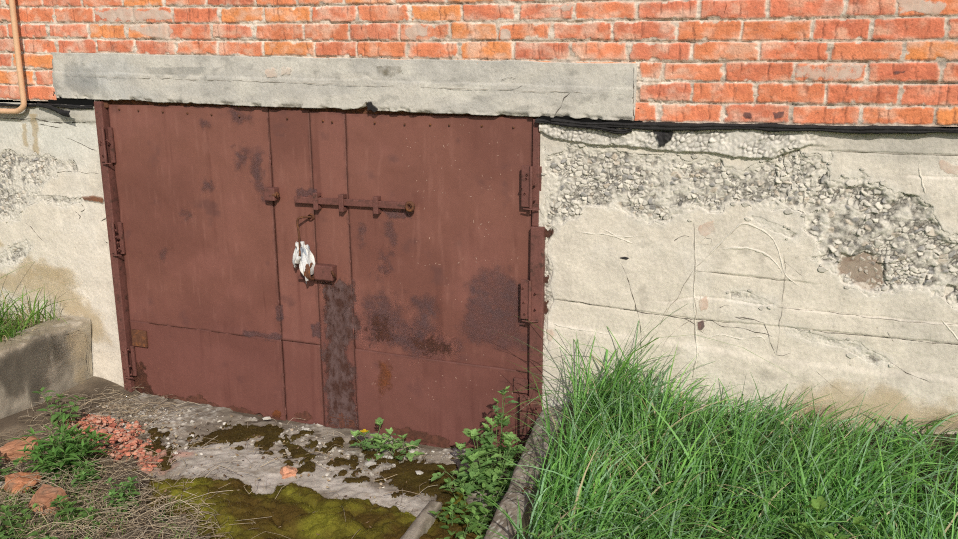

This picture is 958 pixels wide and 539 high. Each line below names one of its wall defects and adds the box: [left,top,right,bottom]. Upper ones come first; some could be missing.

spalling [0,239,32,266]
spalling [0,148,83,222]
corrosion [321,279,394,430]
spalling [542,383,562,410]
spalling [539,143,958,370]
crack [555,228,958,382]